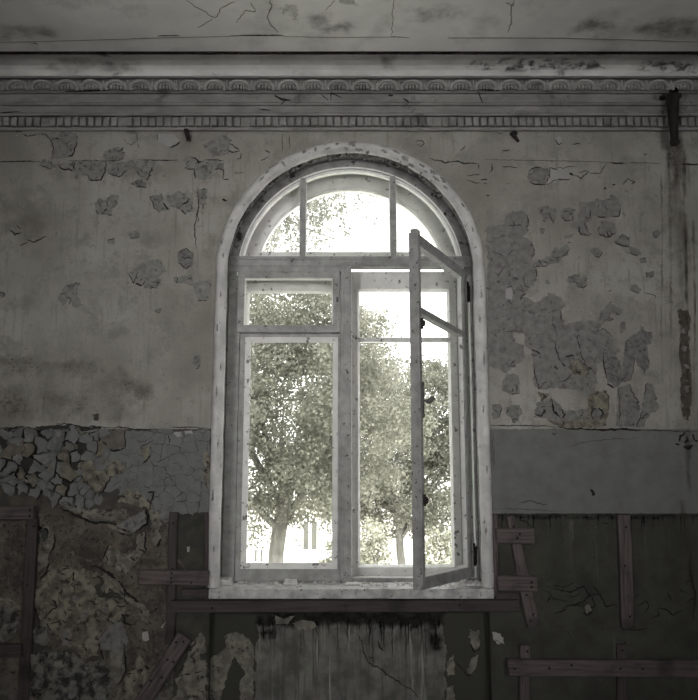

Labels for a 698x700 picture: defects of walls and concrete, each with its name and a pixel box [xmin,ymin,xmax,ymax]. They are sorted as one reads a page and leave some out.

peeling [37,131,155,188]
crack [416,133,660,196]
peeling [149,156,224,301]
peeling [481,194,646,326]
peeling [534,302,659,429]
peeling [0,414,219,532]
crack [544,555,696,631]
flaking render [29,626,113,700]
flaking render [172,632,255,700]
damp [256,612,443,659]
crack [353,632,420,699]
peeling [492,632,505,645]